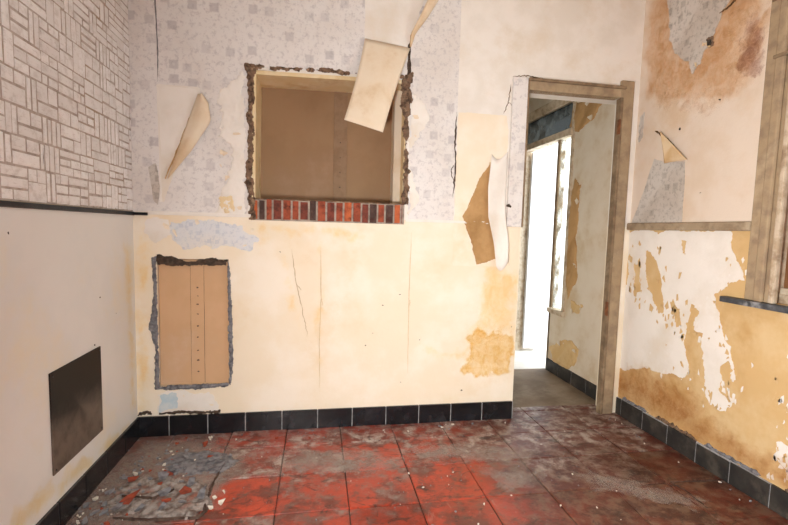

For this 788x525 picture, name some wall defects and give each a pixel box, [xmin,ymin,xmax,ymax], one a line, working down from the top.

spalling [400,72,430,214]
peeling [569,102,602,132]
spalling [144,63,357,416]
peeling [566,179,583,314]
peeling [549,340,578,369]
peeling [620,230,747,412]
peeling [622,374,788,493]